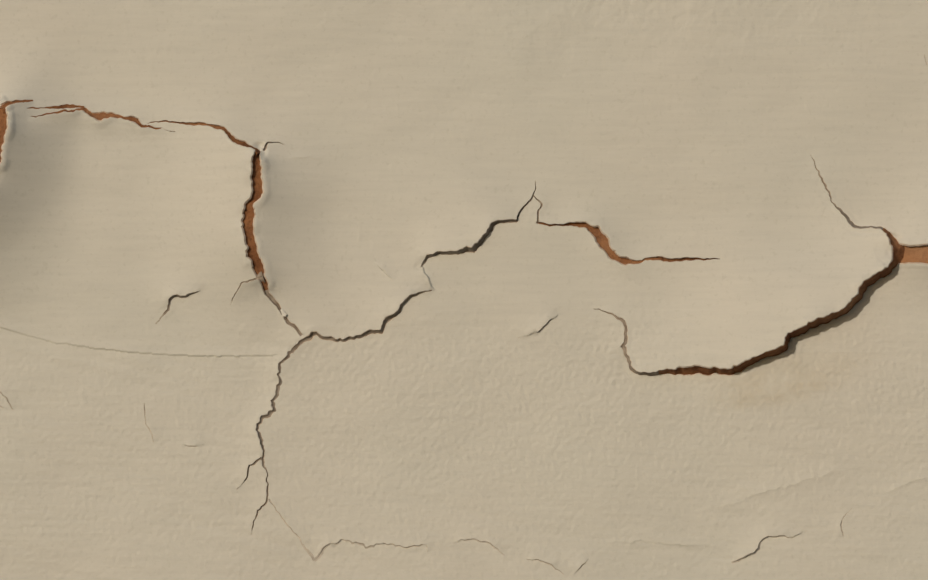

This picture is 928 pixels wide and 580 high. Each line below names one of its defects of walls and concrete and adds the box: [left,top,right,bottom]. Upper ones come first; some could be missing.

peeling [0,42,539,352]
crack [532,193,717,277]
peeling [591,153,905,379]
crack [0,323,316,564]